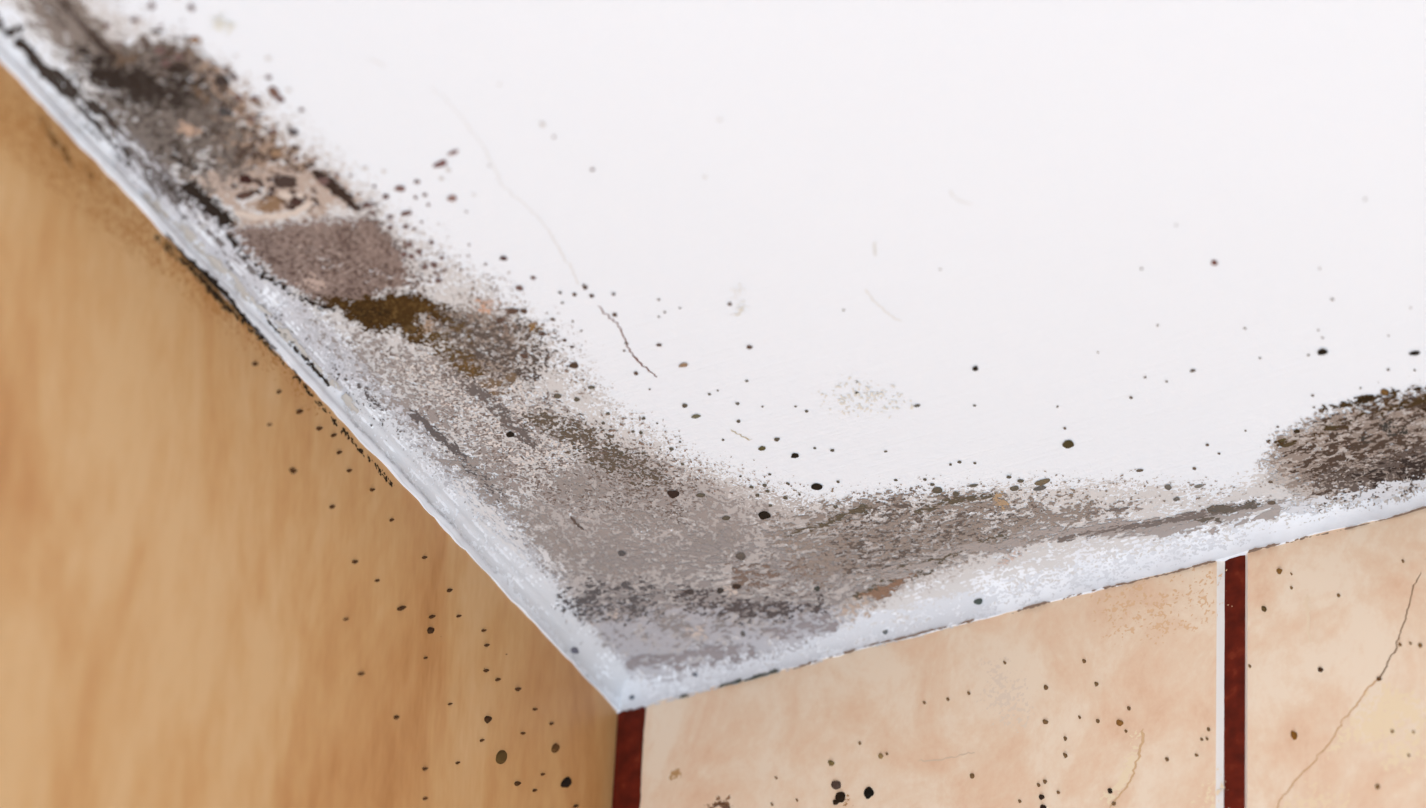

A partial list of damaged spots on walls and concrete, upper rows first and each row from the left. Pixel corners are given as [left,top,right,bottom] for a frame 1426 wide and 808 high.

water stain [433,150,458,180]
water stain [0,77,393,487]
water stain [794,375,922,420]
water stain [1337,506,1426,532]
water stain [1248,532,1329,553]
water stain [1097,571,1222,645]
crack [1277,573,1421,808]